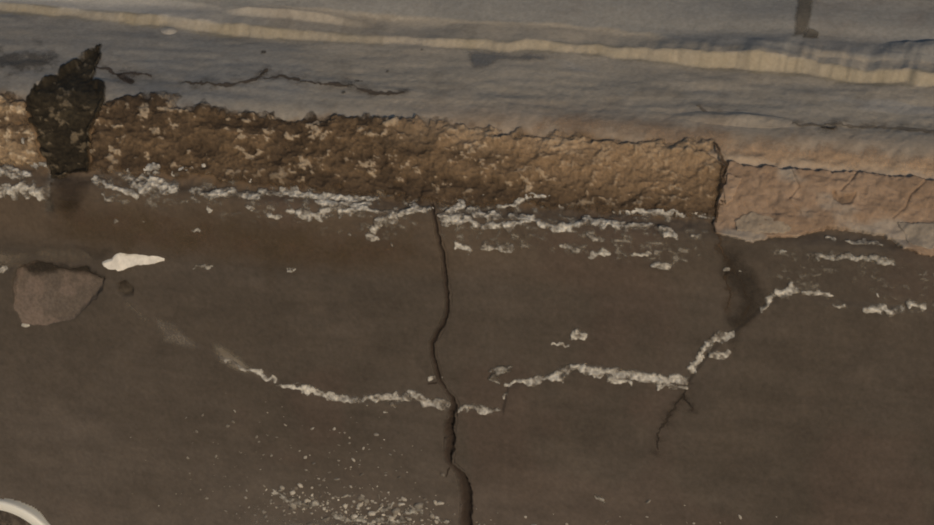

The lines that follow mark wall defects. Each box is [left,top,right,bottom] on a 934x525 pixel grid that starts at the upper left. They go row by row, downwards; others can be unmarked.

leakage [0,162,79,212]
spalling [13,253,165,327]
leakage [215,347,500,418]
leakage [91,162,715,270]
crack [428,198,475,525]
spalling [0,44,934,257]
leakage [489,257,846,399]
crack [656,385,693,449]
leakage [808,235,895,266]
leakage [224,427,455,525]